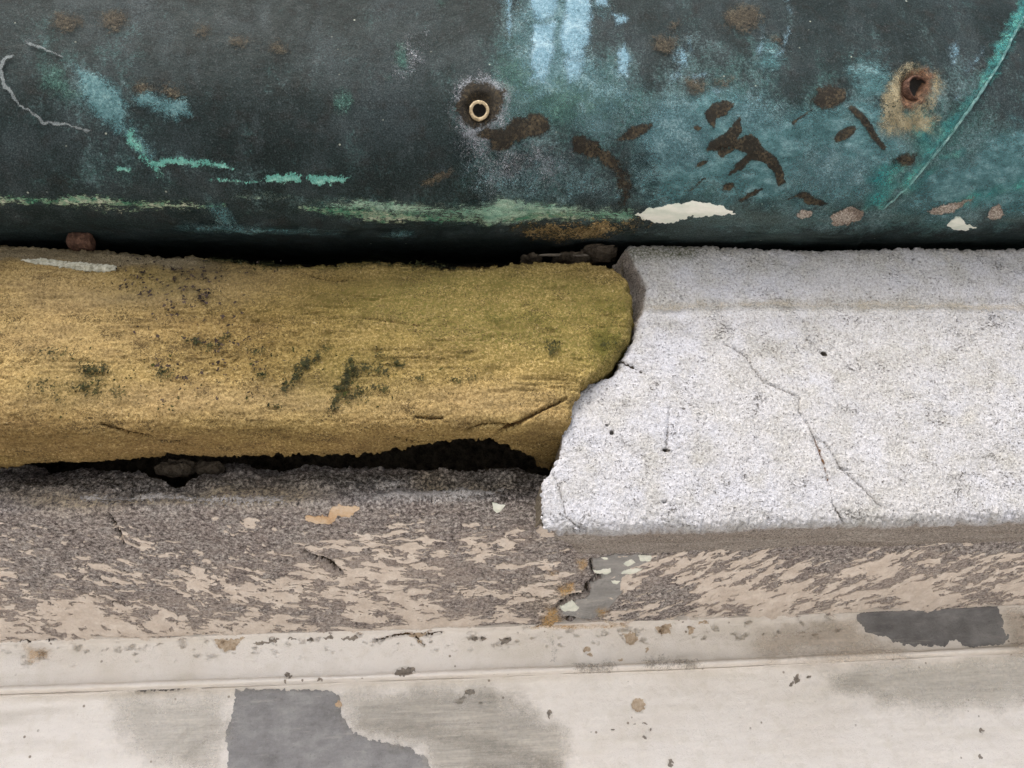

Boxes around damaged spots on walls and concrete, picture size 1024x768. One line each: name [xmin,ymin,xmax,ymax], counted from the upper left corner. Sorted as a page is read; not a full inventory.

corrosion [880,65,939,135]
crack [725,345,881,521]
peeling [0,513,587,652]
peeling [592,542,1024,653]